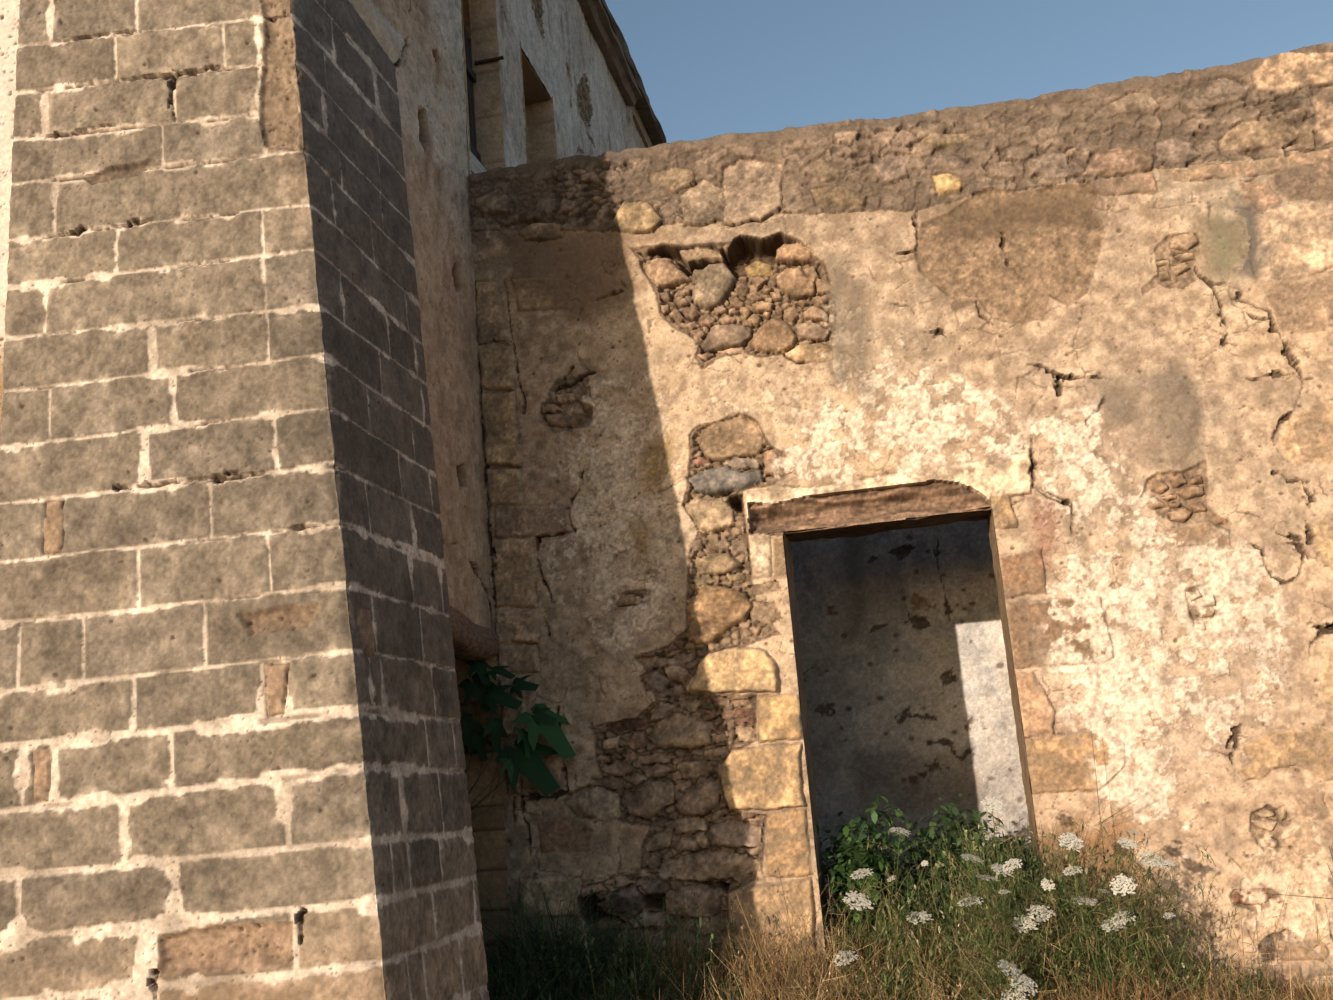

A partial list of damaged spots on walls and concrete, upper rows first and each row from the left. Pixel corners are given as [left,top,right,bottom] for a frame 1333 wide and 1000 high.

crack [1027,437,1075,537]
crack [1026,362,1115,431]
crack [1191,263,1333,657]
spalling [537,231,1300,977]
peeling [1227,804,1333,964]